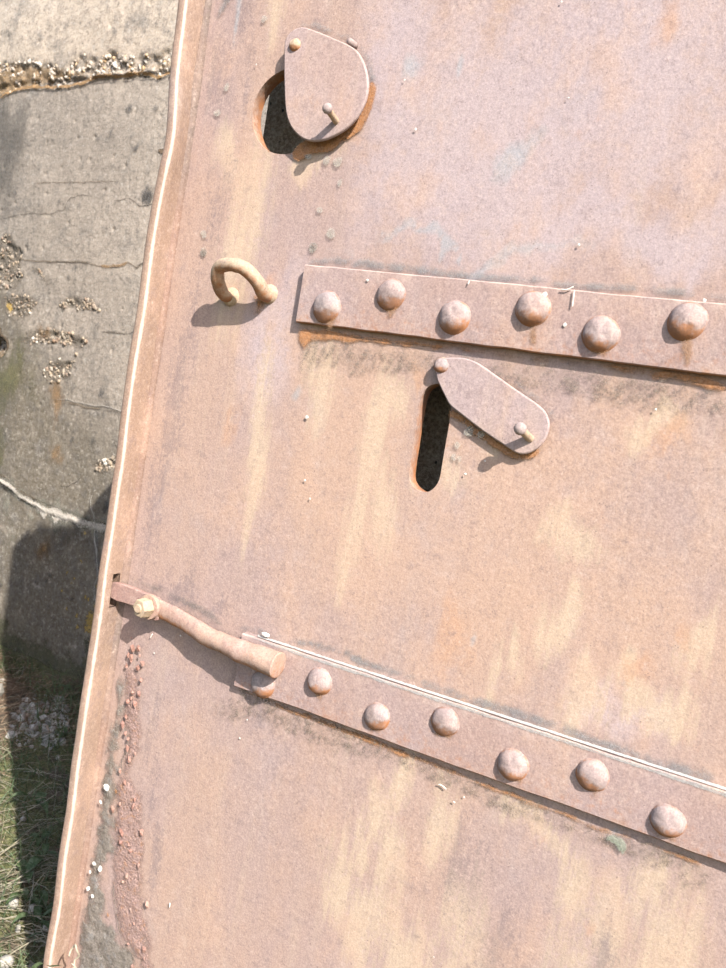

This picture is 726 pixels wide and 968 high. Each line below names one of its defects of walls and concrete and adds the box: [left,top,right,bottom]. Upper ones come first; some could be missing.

corrosion [292,82,376,161]
spalling [0,233,48,319]
spalling [0,328,9,358]
spalling [22,327,88,384]
corrosion [299,317,444,348]
corrosion [608,365,725,390]
spalling [93,456,116,473]
crack [0,474,107,600]
corrosion [107,636,152,968]